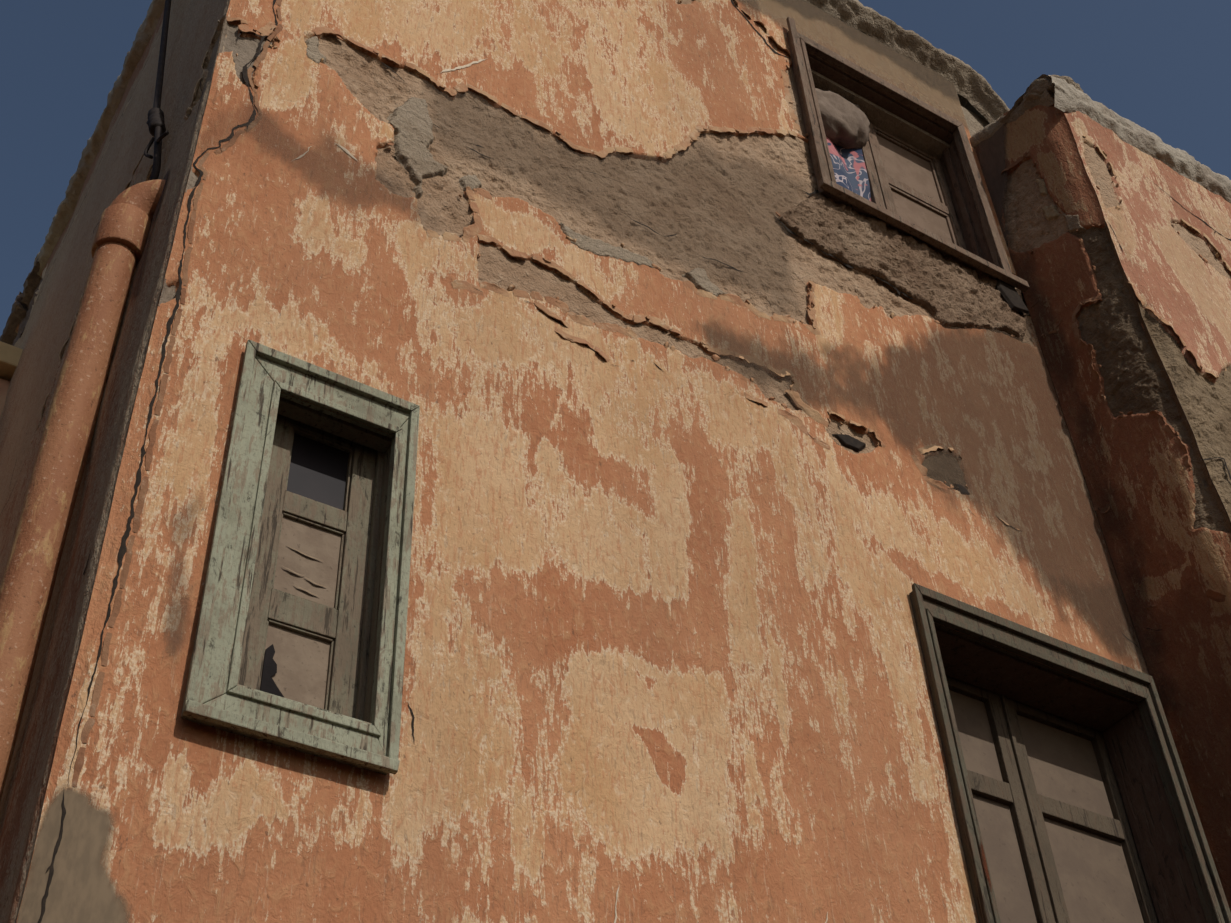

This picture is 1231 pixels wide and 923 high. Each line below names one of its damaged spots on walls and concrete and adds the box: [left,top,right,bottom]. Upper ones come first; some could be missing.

crack [36,0,283,923]
peeling [183,12,280,120]
peeling [304,26,978,447]
peeling [911,446,970,495]
peeling [1068,135,1231,533]
crack [1153,182,1231,240]